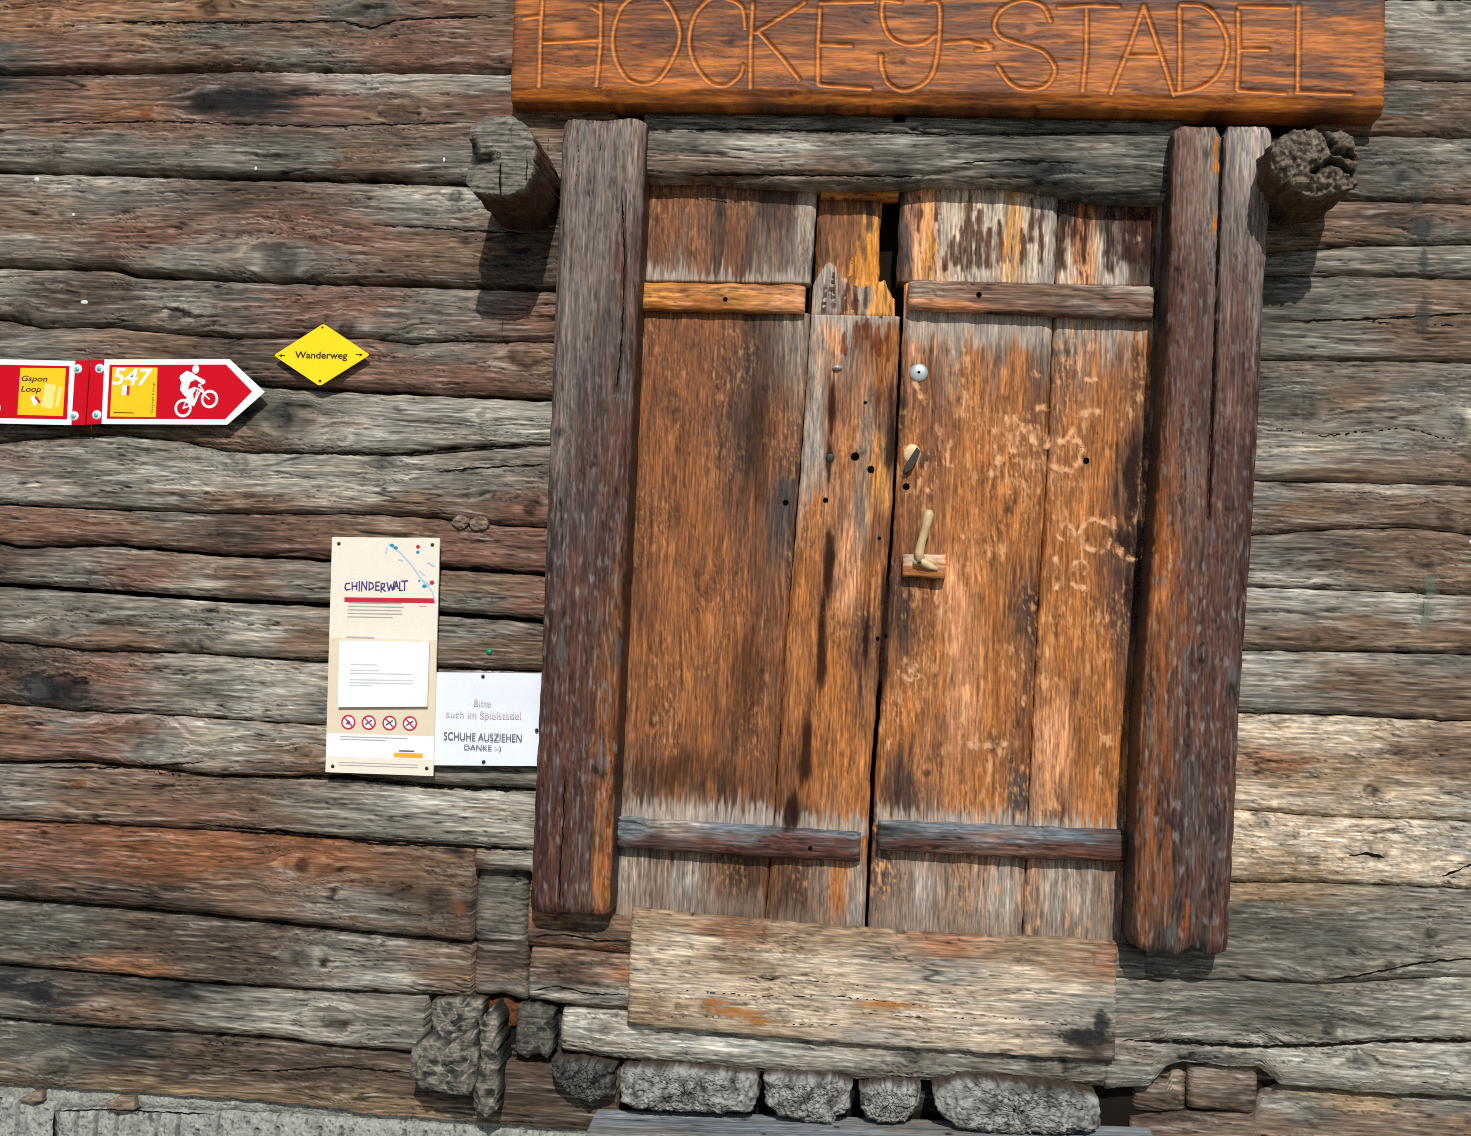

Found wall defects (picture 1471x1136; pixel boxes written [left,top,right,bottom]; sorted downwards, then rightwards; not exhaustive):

crack [1349,851,1385,859]
crack [1442,864,1471,876]